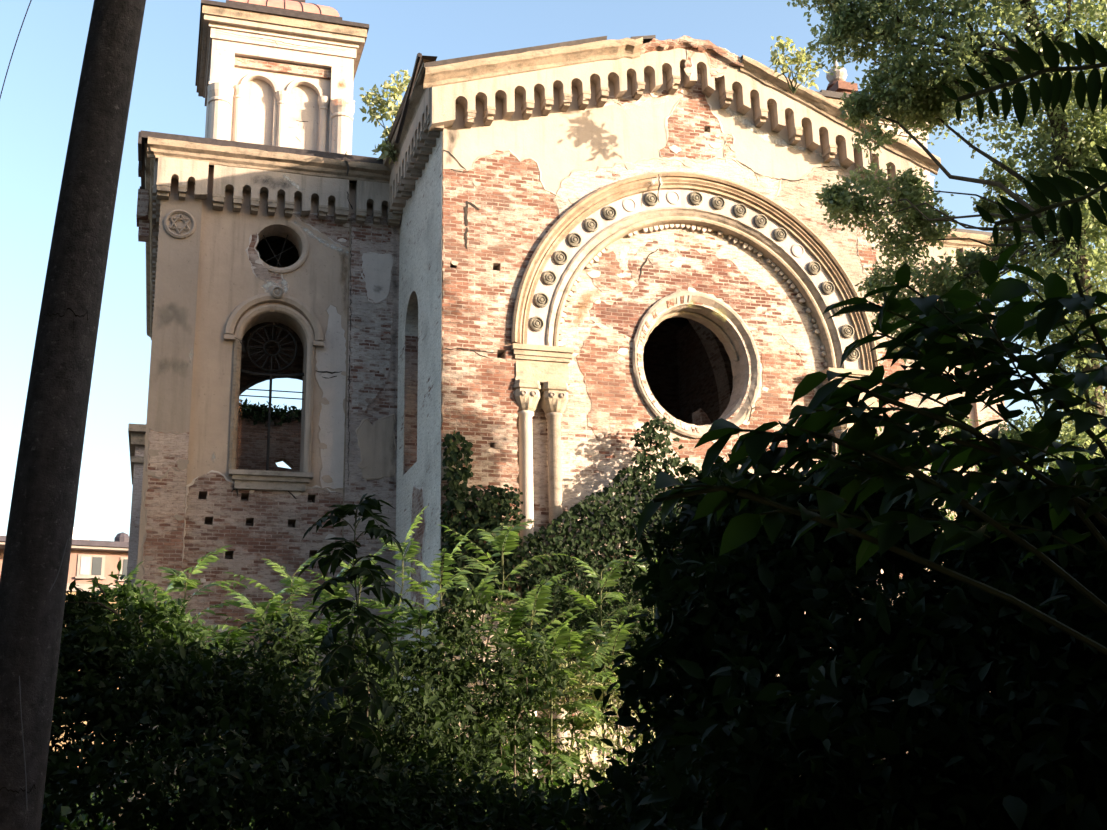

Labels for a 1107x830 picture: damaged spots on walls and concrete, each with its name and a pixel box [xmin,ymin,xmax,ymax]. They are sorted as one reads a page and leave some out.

spalling [245,233,288,288]
peeling [292,211,394,248]
peeling [441,47,936,603]
crack [736,160,839,182]
peeling [140,263,394,650]
peeling [410,485,426,634]